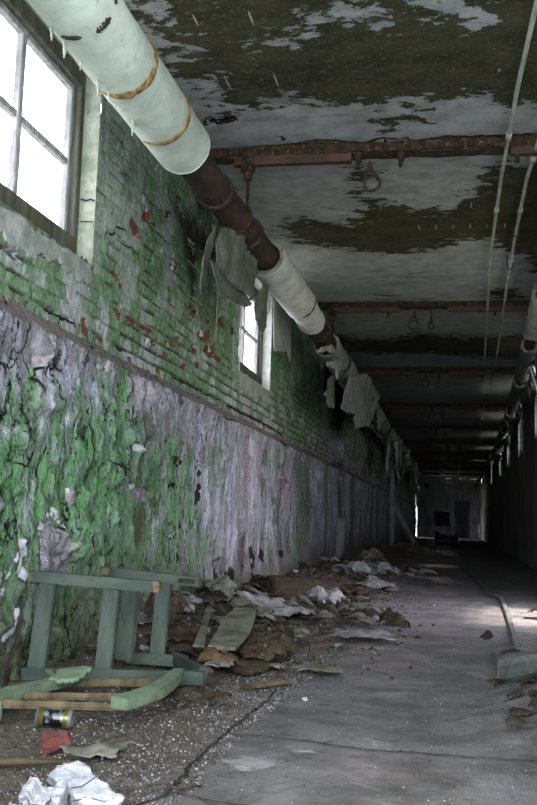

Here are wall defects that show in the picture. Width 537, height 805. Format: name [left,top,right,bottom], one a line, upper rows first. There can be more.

peeling [126,0,537,135]
spalling [1,241,19,267]
flaking render [130,207,155,238]
peeling [266,160,537,274]
crack [25,301,94,344]
flaking render [95,360,117,372]
flaking render [111,306,155,346]
flaking render [179,303,234,369]
crack [0,324,50,495]
leakage [0,519,29,598]
leakage [2,608,19,642]
crack [136,686,537,805]